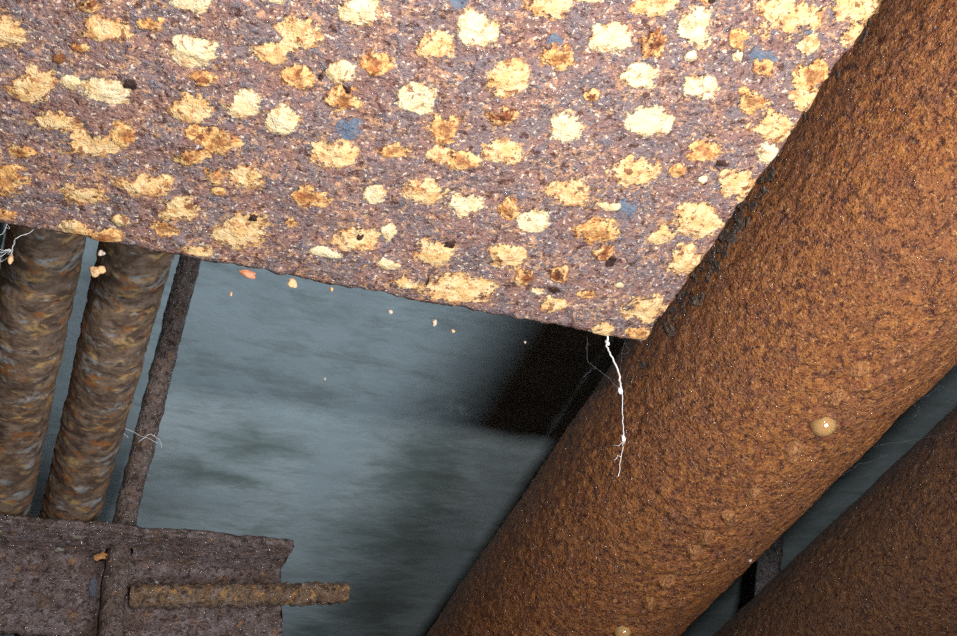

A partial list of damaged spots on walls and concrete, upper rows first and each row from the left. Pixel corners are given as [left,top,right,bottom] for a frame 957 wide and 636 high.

corrosion [1,62,136,158]
spalling [122,79,138,90]
corrosion [166,34,301,196]
corrosion [249,14,396,116]
corrosion [415,8,500,61]
corrosion [394,57,530,171]
corrosion [624,104,676,138]
corrosion [588,0,716,90]
corrosion [728,0,882,164]
corrosion [309,222,499,307]
corrosion [646,202,725,274]
corrosion [592,293,669,340]